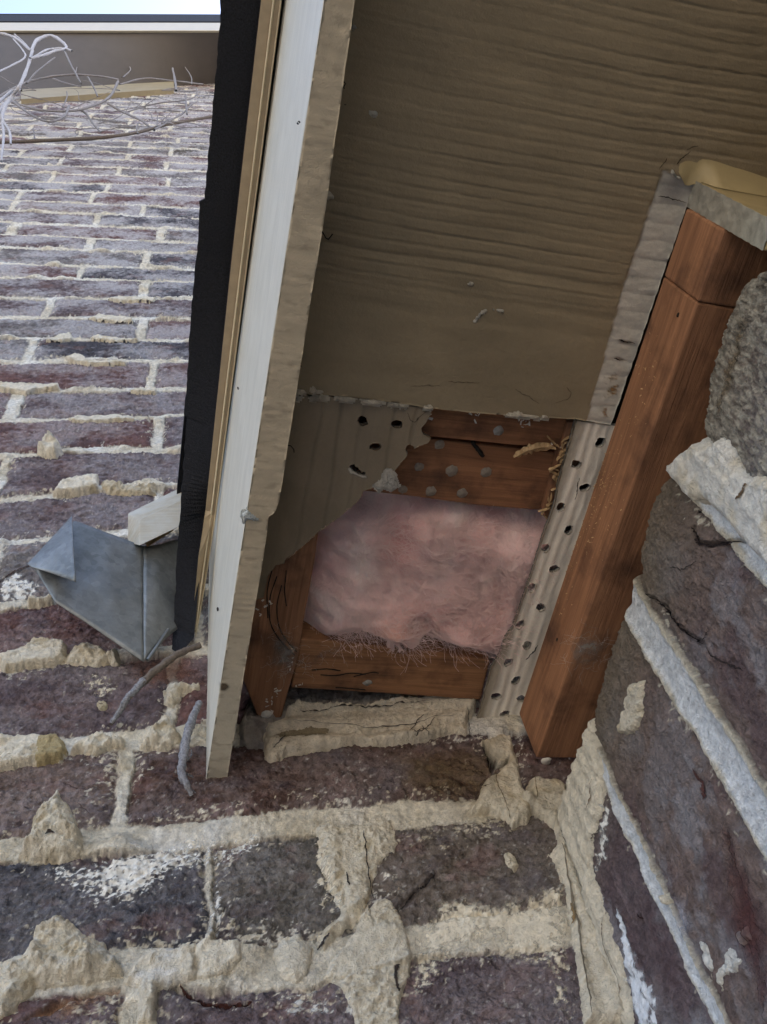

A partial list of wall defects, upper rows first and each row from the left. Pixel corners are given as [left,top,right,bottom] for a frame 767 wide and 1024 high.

peeling [295,386,409,410]
peeling [504,411,549,422]
peeling [348,468,401,493]
crack [671,511,741,571]
crack [645,593,743,671]
damp [45,835,262,907]
crack [363,830,374,899]